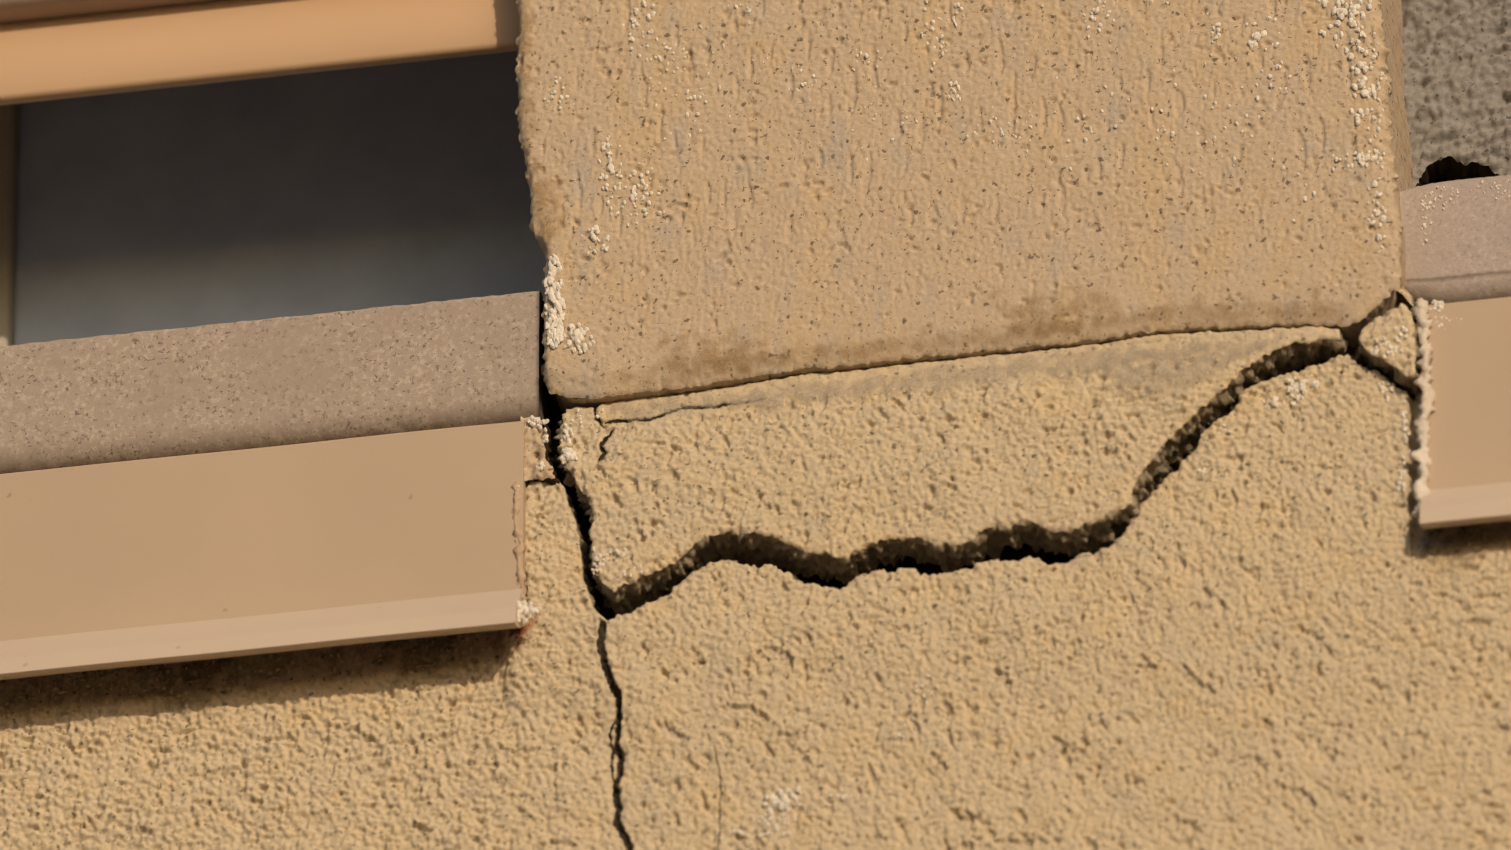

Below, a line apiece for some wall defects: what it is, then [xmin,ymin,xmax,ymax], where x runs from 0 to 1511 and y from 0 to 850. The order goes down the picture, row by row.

crack [1295,345,1400,388]
crack [777,543,1109,590]
crack [534,398,763,850]